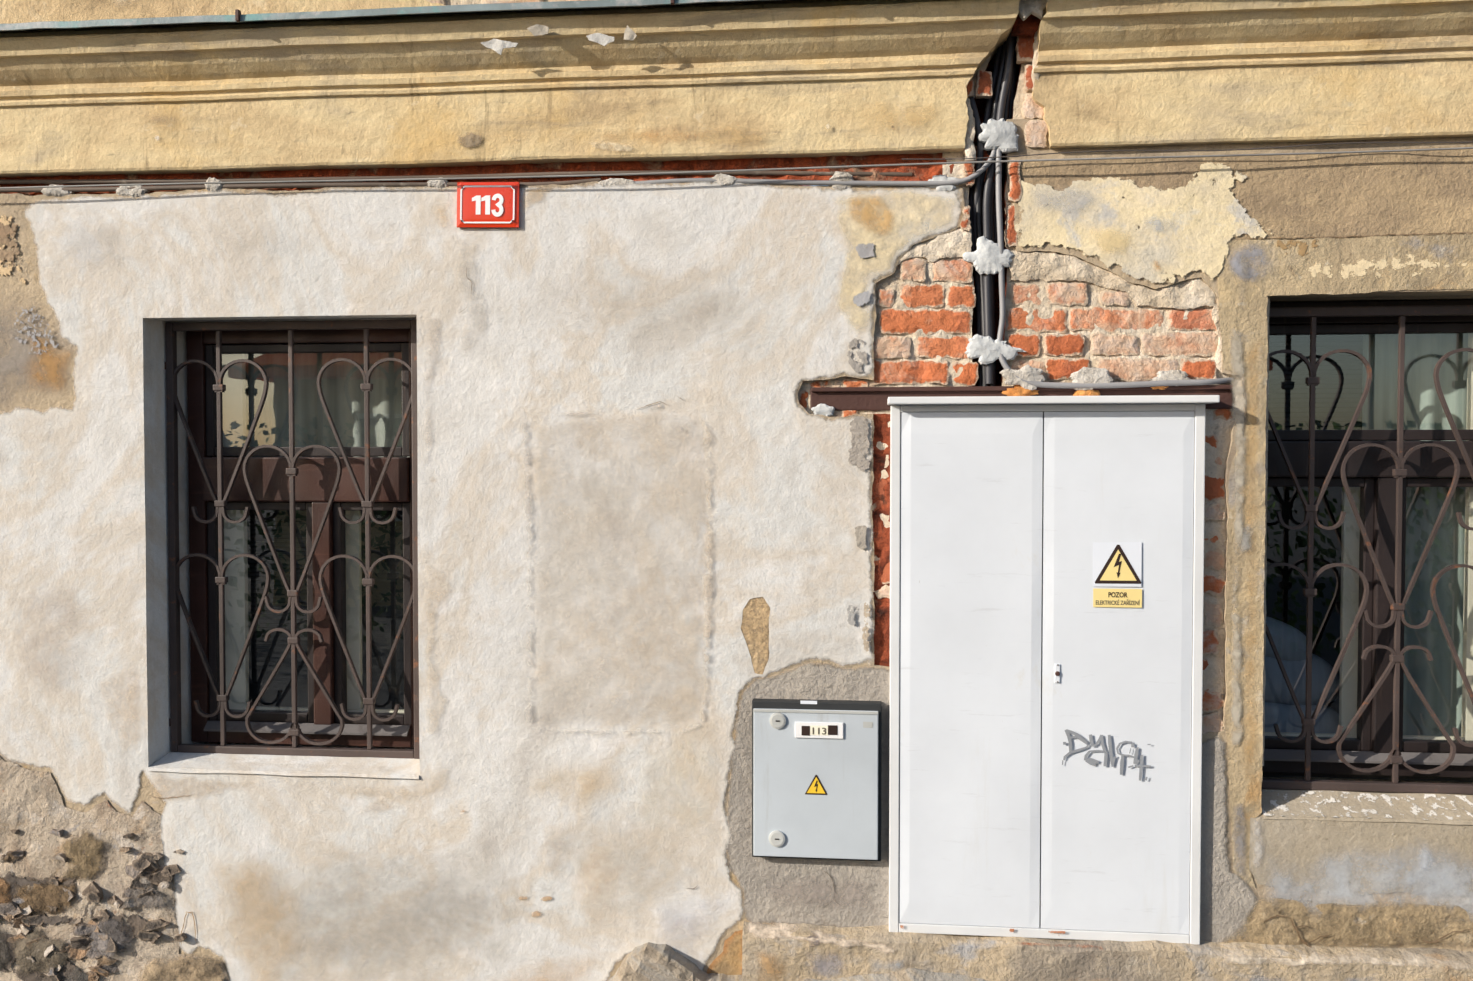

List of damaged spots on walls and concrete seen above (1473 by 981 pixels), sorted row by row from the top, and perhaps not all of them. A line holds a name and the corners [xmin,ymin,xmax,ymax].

peeling [0,214,26,284]
flaking render [798,0,1272,766]
flaking render [741,598,770,674]
peeling [1261,790,1473,821]
flaking render [0,758,199,981]
flaking render [213,963,230,981]